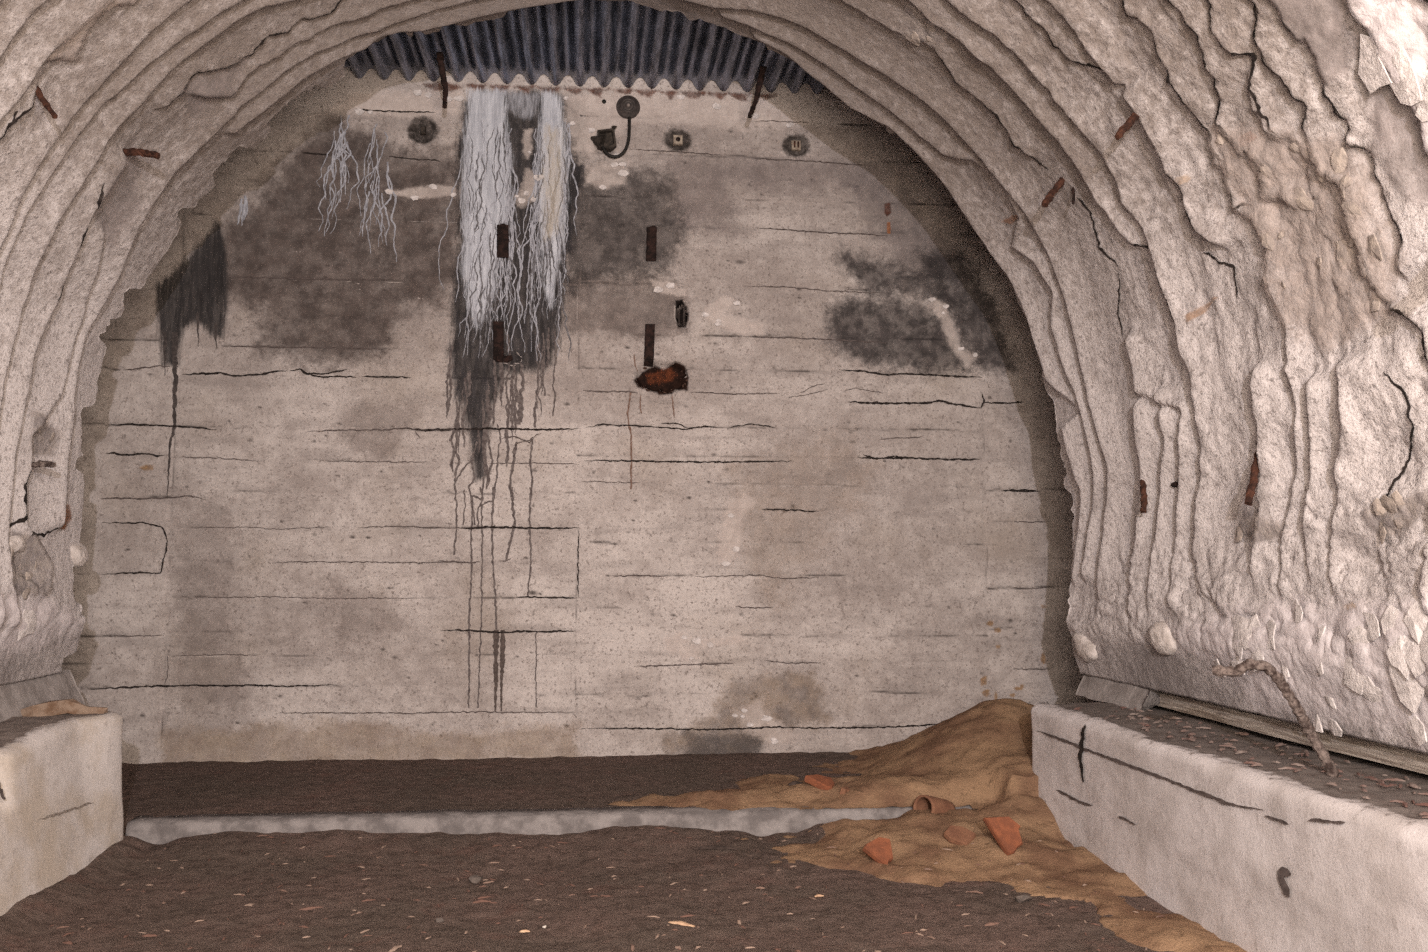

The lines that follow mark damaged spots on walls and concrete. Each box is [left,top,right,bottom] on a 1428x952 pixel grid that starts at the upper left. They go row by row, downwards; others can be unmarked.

crack [637,148,720,156]
crack [755,158,868,166]
crack [760,228,888,236]
crack [743,285,881,293]
damp [829,252,1013,373]
crack [126,346,410,378]
damp [157,88,683,711]
crack [106,423,252,461]
corrosion [626,393,642,489]
crack [9,473,63,594]
crack [102,495,663,633]
crack [700,574,818,609]